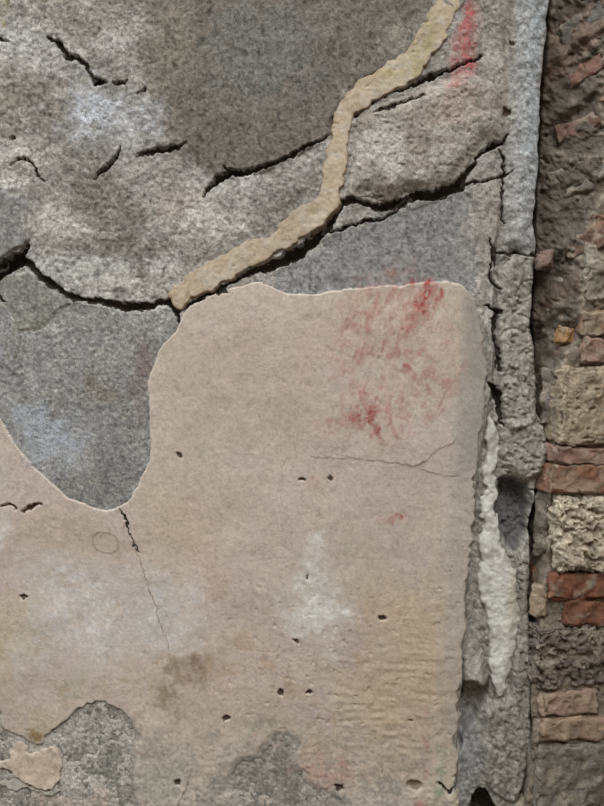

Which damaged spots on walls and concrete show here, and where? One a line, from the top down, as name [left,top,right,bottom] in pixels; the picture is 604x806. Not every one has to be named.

crack [40,0,146,94]
crack [355,55,482,118]
crack [0,135,513,322]
crack [484,239,534,427]
flaking render [0,302,181,510]
crack [310,439,459,477]
crack [121,511,169,649]
flaking render [0,701,135,806]
flaking render [231,751,344,806]